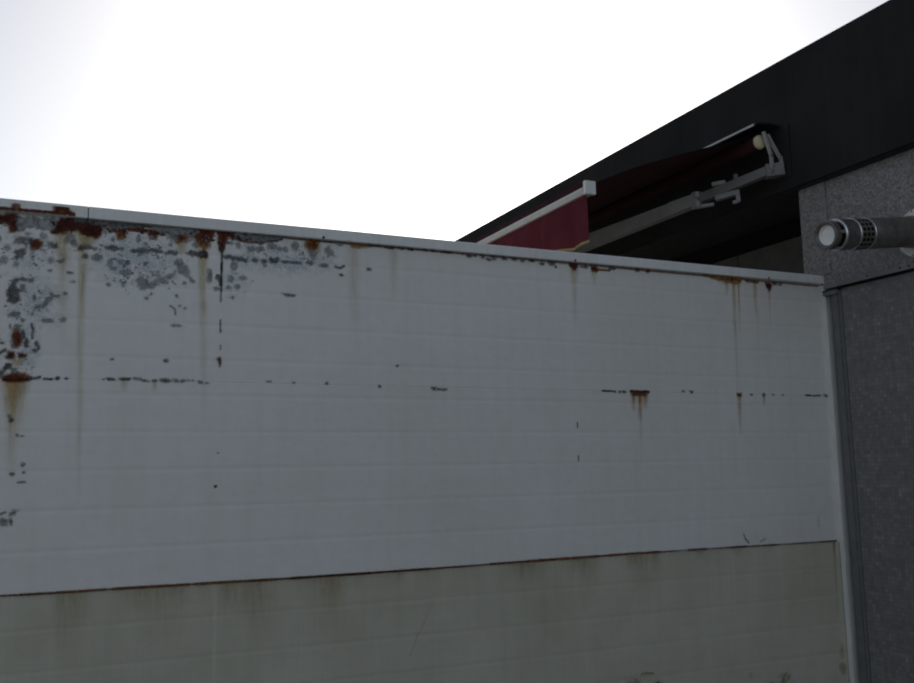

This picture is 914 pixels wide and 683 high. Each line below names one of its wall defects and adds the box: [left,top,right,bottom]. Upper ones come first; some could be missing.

peeling [0,216,209,365]
peeling [207,232,345,299]